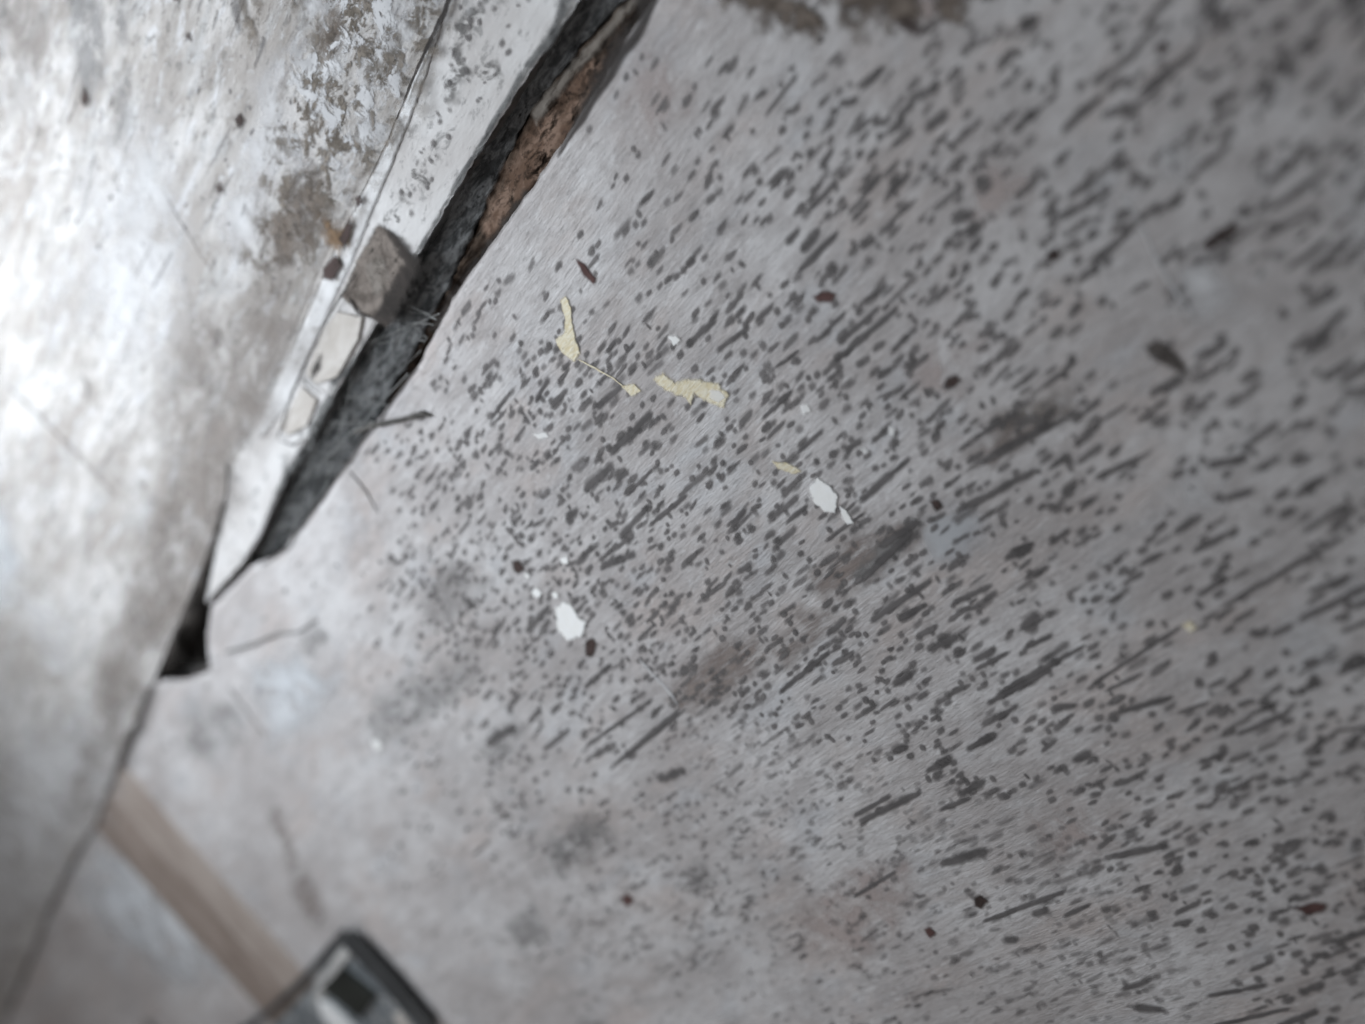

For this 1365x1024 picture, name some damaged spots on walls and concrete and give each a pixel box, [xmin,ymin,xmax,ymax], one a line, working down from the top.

crack [252,0,657,564]
crack [213,463,228,533]
crack [2,689,150,1024]